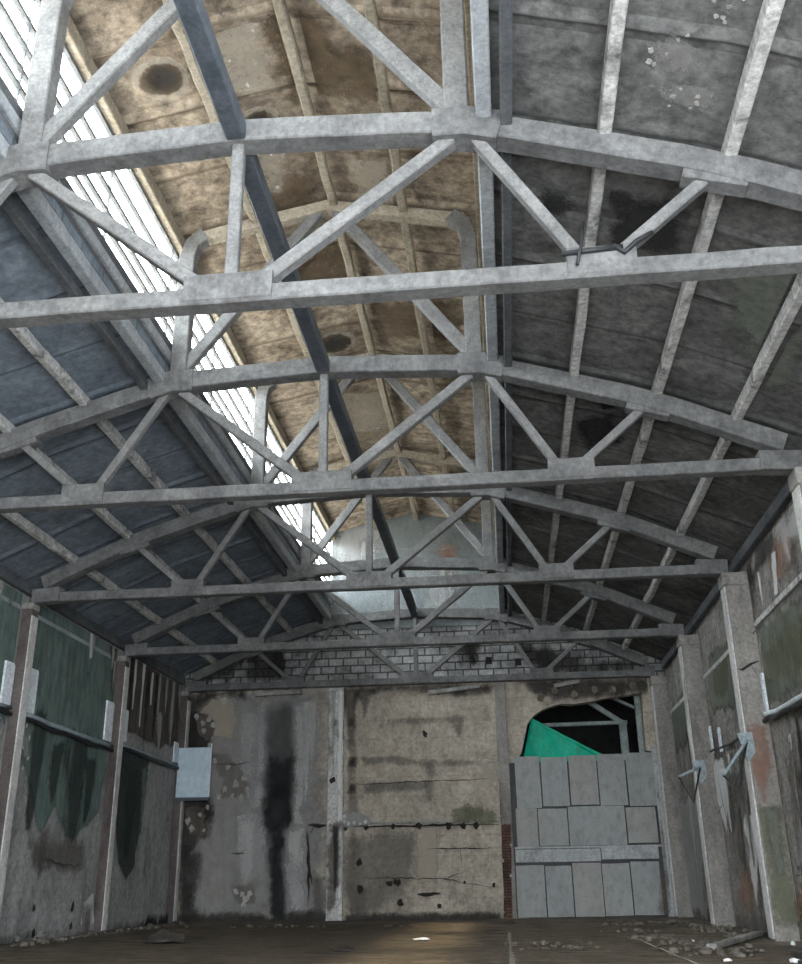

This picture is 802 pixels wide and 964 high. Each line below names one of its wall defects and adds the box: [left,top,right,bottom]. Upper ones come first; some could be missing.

peeling [185,697,249,837]
leakage [152,683,500,924]
rust [747,725,771,800]
peeling [69,893,94,931]
spalling [140,915,168,926]